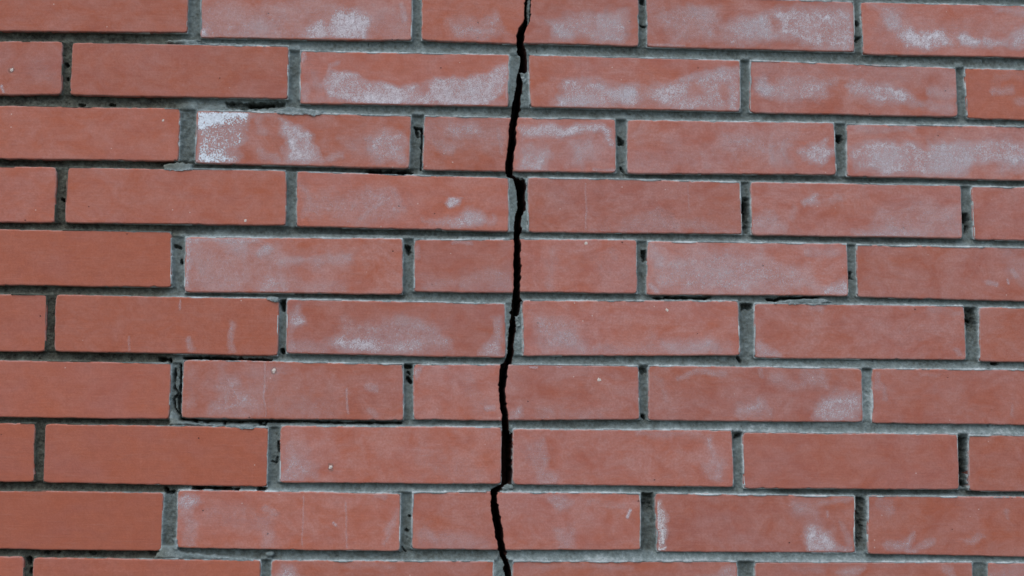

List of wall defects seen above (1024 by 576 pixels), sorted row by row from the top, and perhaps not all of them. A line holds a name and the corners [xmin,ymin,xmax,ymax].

water stain [892,23,997,50]
water stain [327,66,507,105]
water stain [652,72,737,109]
water stain [198,112,248,163]
water stain [283,123,314,161]
crack [490,0,531,576]